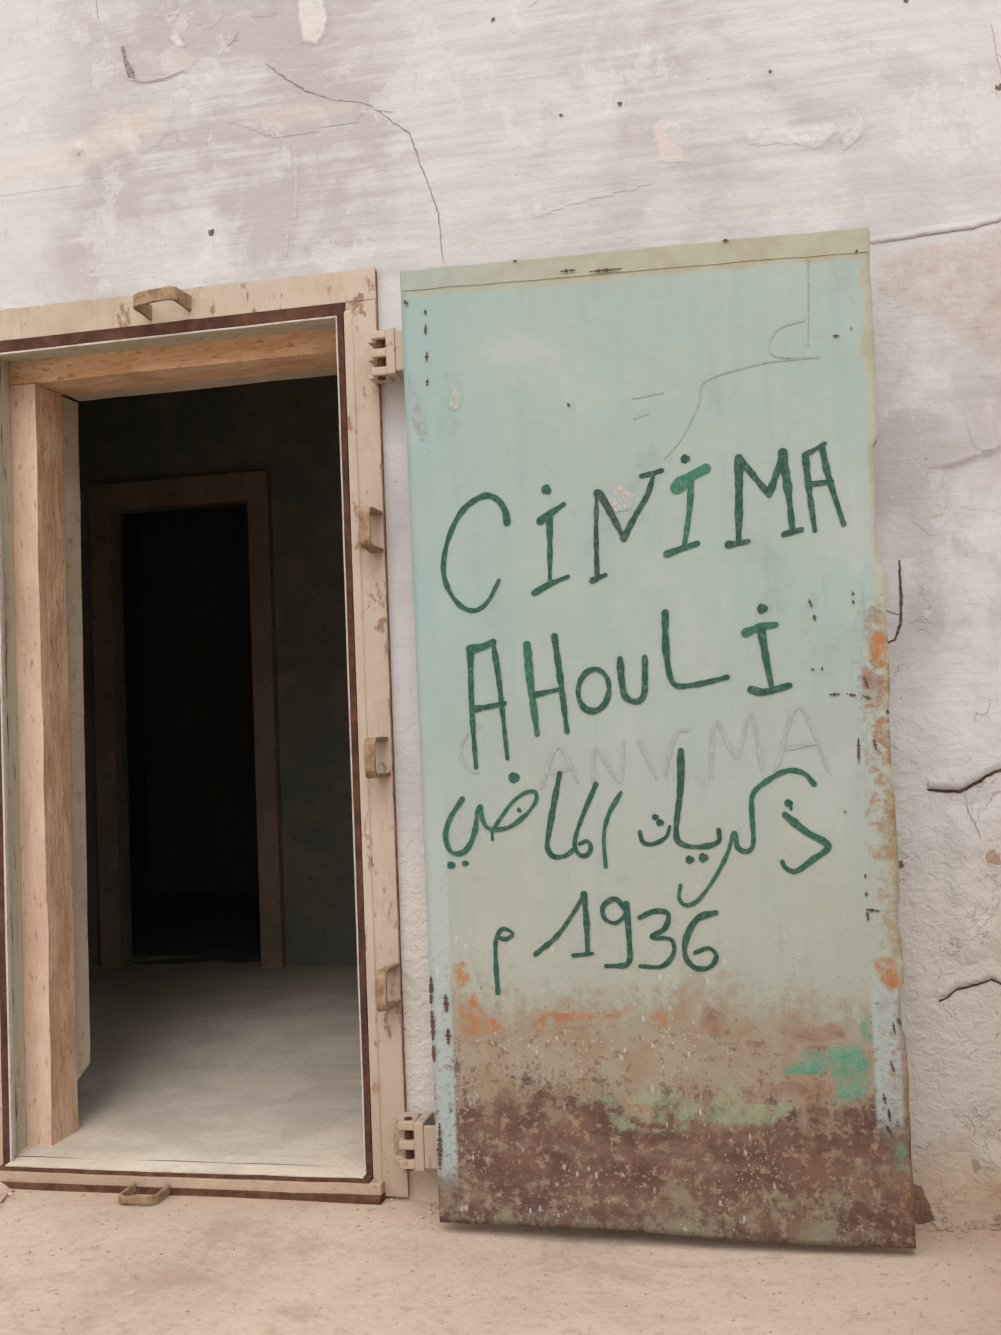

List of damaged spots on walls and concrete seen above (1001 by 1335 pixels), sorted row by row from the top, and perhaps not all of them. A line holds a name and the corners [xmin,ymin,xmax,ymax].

peeling [296,0,328,45]
crack [268,65,444,262]
crack [927,747,1001,838]
crack [938,959,1001,1002]